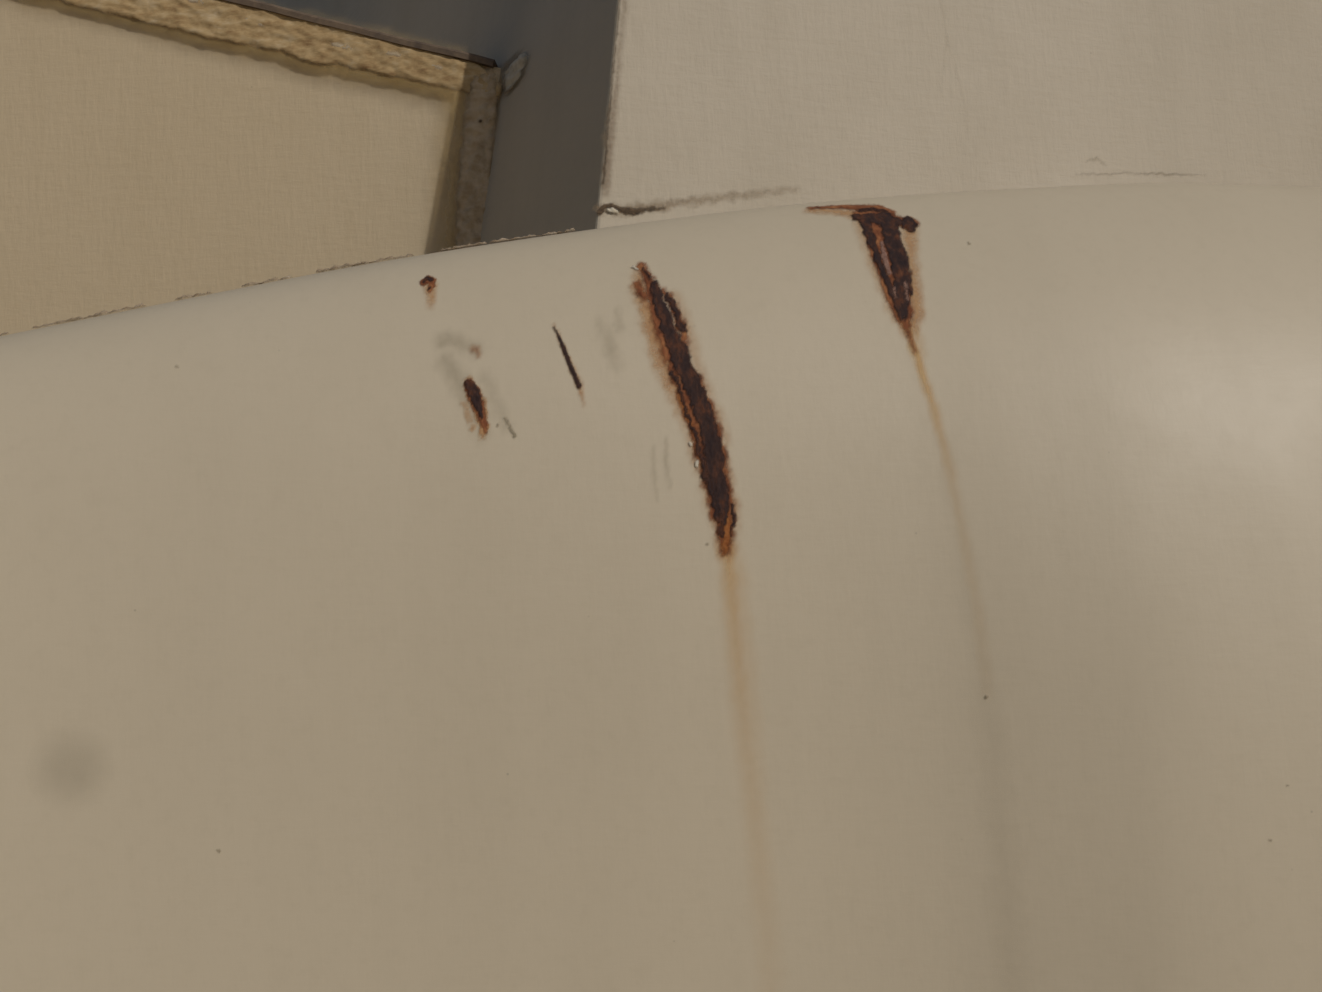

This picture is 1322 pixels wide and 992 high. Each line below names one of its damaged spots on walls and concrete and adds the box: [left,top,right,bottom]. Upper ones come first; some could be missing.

rust [420,275,436,298]
rust [808,204,928,391]
rust [464,378,489,437]
rust [632,262,737,556]